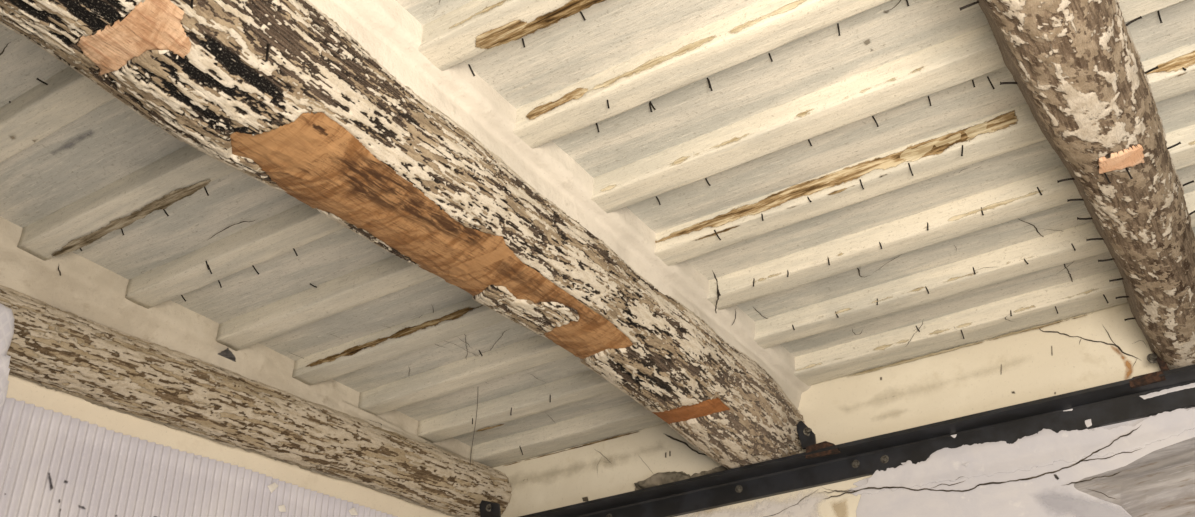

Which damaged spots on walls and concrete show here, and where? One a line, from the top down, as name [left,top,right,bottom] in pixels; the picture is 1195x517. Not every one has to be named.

peeling [1085,415,1156,430]
peeling [1140,383,1195,399]
crack [764,427,1140,517]
peeling [853,428,1195,517]